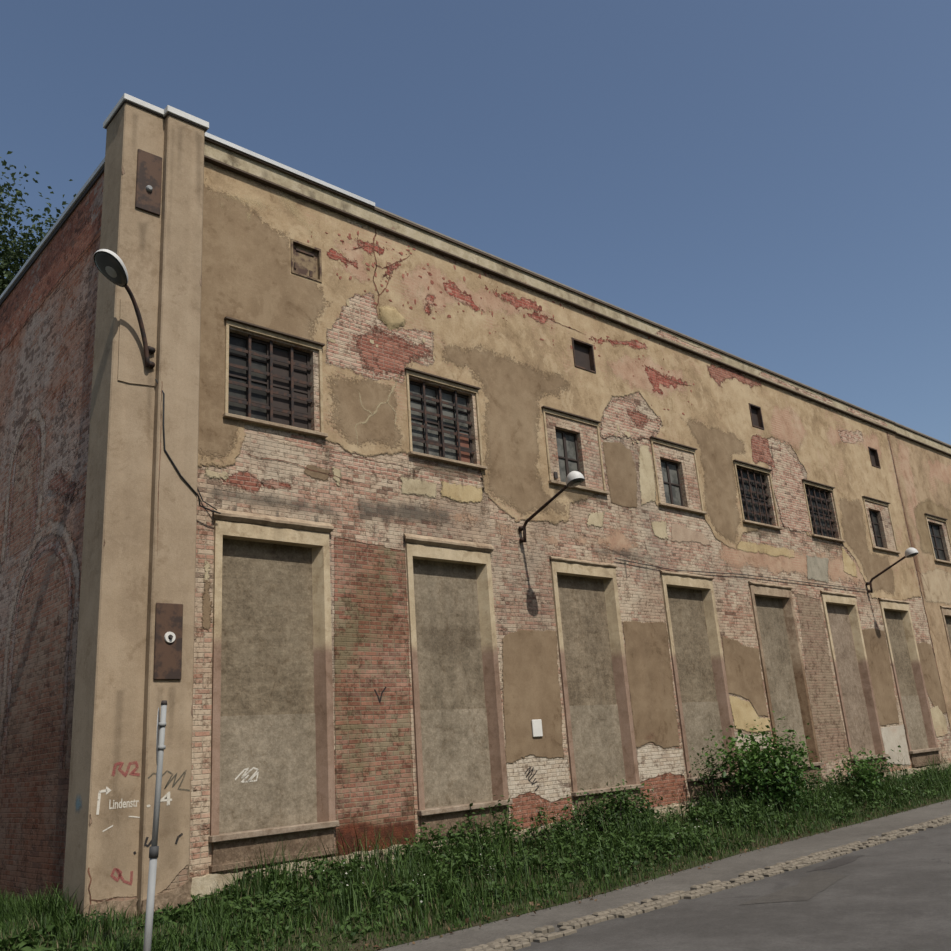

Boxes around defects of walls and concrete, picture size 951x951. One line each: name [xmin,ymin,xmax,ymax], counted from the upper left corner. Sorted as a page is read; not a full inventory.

crack [350,228,410,319]
spalling [324,231,564,383]
crack [355,370,403,446]
spalling [589,330,834,444]
spalling [220,470,294,493]
spalling [412,466,483,488]
spalling [751,434,812,534]
peeling [506,755,574,831]
peeling [637,744,689,808]